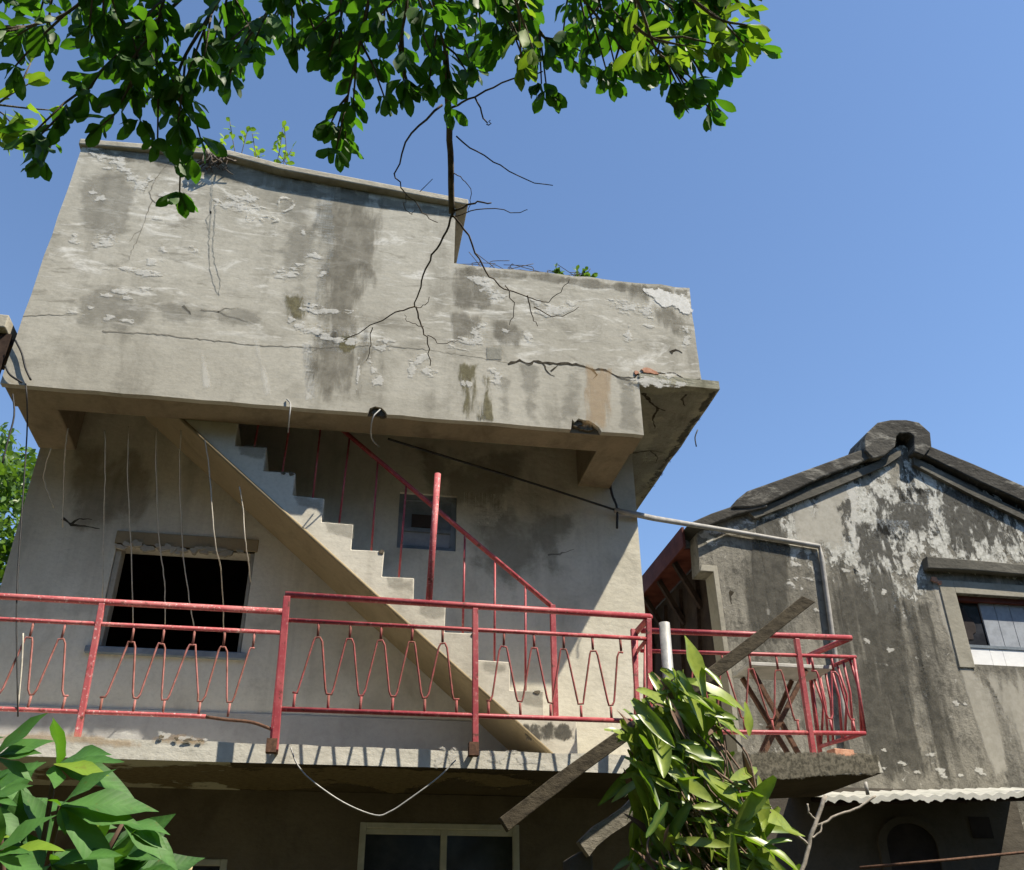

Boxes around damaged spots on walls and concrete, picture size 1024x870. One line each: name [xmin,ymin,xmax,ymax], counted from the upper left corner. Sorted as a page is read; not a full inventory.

water stain [89,149,173,166]
flaking render [214,190,266,211]
water stain [200,164,451,395]
crack [102,165,687,462]
water stain [496,323,520,344]
water stain [453,268,687,339]
flaking render [609,288,693,347]
water stain [481,378,493,420]
spalling [572,422,593,432]
peeling [699,445,1024,617]
water stain [835,459,1024,780]
spalling [159,732,207,742]